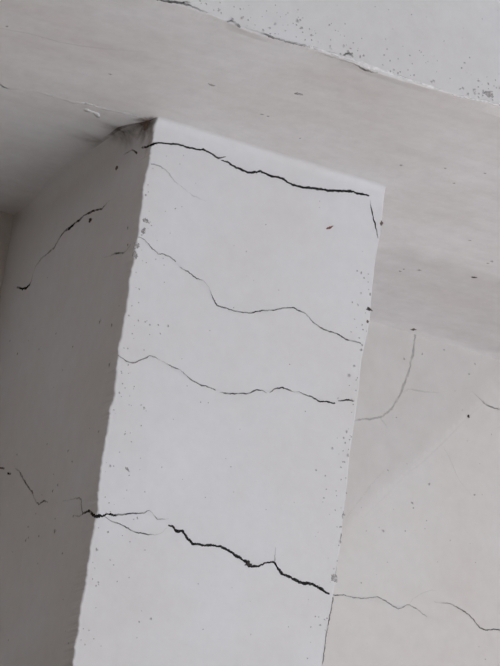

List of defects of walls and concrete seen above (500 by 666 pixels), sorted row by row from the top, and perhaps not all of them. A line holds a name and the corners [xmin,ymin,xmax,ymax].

crack [132,142,378,237]
crack [48,208,103,254]
crack [212,296,361,344]
crack [123,356,353,404]
crack [0,467,45,505]
crack [82,509,400,609]